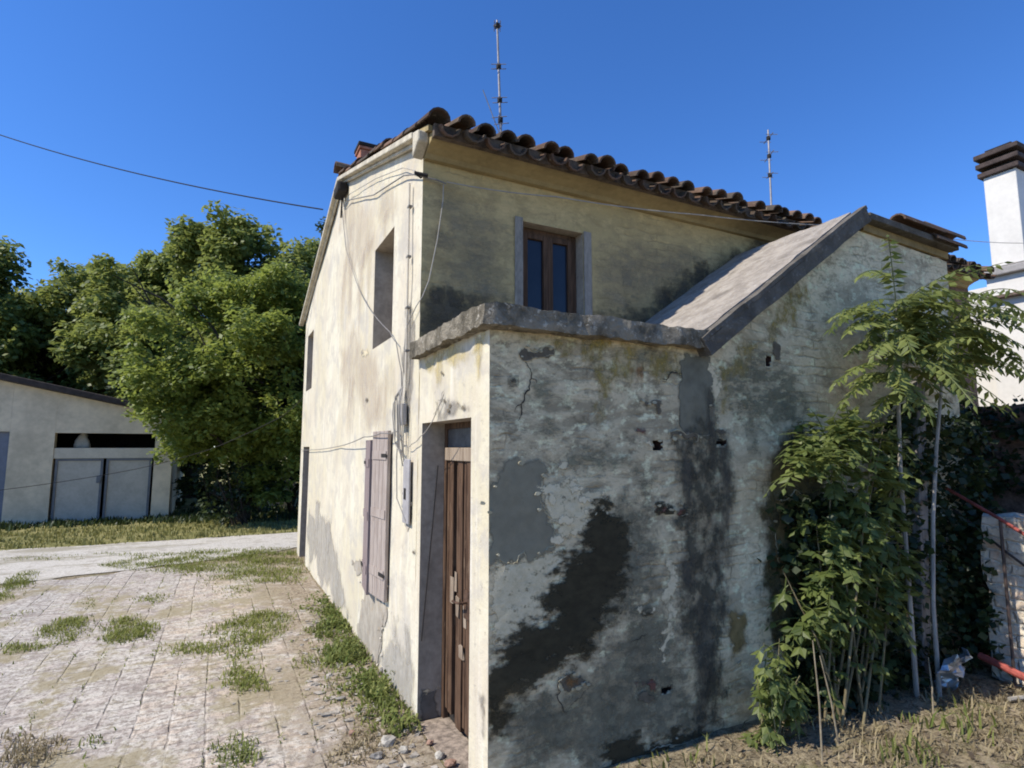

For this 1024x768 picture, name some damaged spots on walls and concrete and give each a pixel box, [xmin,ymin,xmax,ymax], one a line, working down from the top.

leakage [420,288,483,334]
peeling [519,345,555,362]
spalling [765,341,781,368]
crack [514,362,537,421]
spalling [636,363,727,451]
peeling [480,457,609,566]
spalling [655,501,688,518]
leakage [481,350,827,768]
peeling [557,672,590,692]